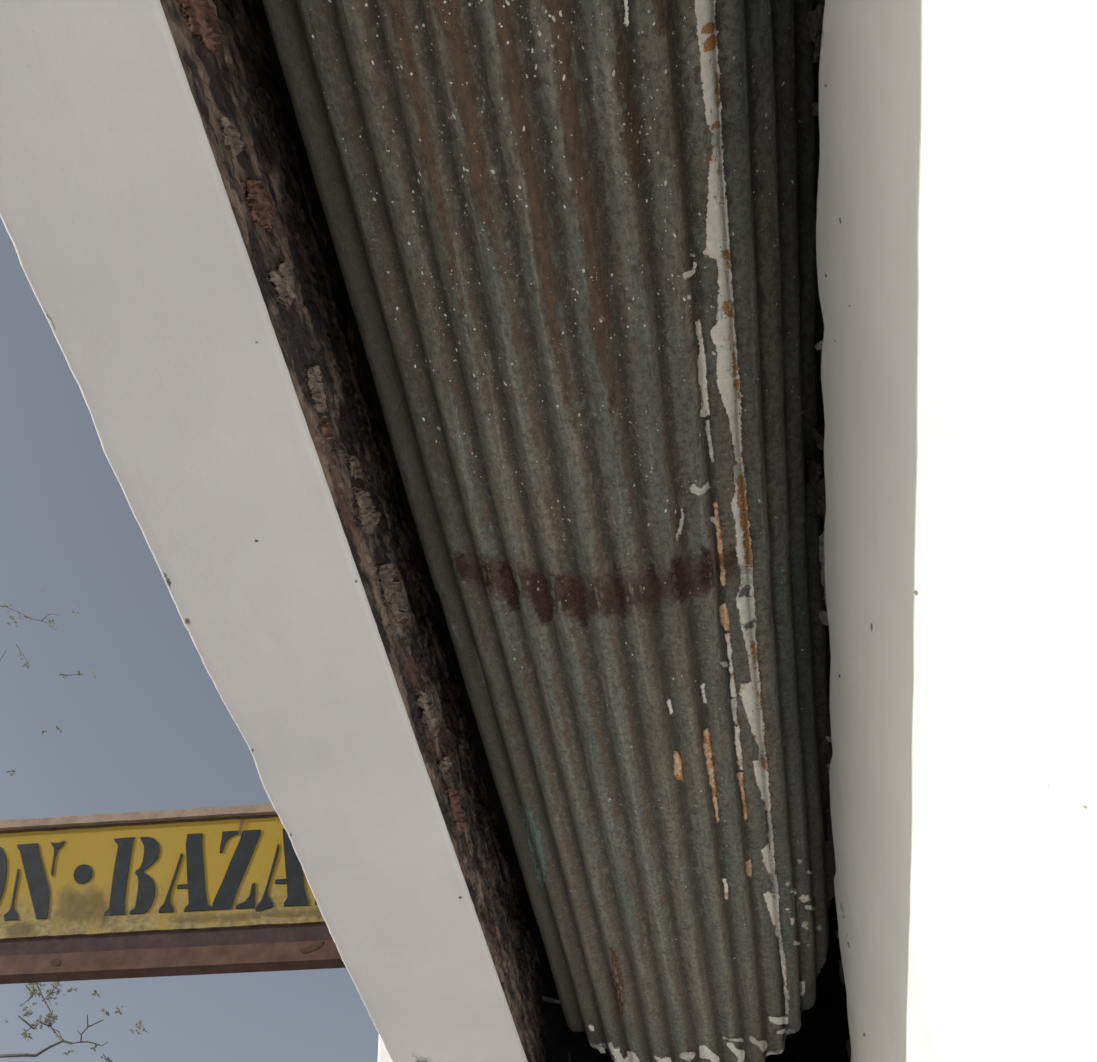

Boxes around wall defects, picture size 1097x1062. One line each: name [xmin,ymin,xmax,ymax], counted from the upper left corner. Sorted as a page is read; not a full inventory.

spalling [177,0,222,56]
spalling [216,115,244,159]
spalling [266,259,295,308]
corrosion [389,0,464,308]
corrosion [435,0,494,248]
corrosion [493,0,569,405]
corrosion [544,0,615,412]
corrosion [615,6,639,180]
spalling [304,365,328,419]
spalling [343,453,381,538]
spalling [375,560,409,625]
peeling [671,0,821,1014]